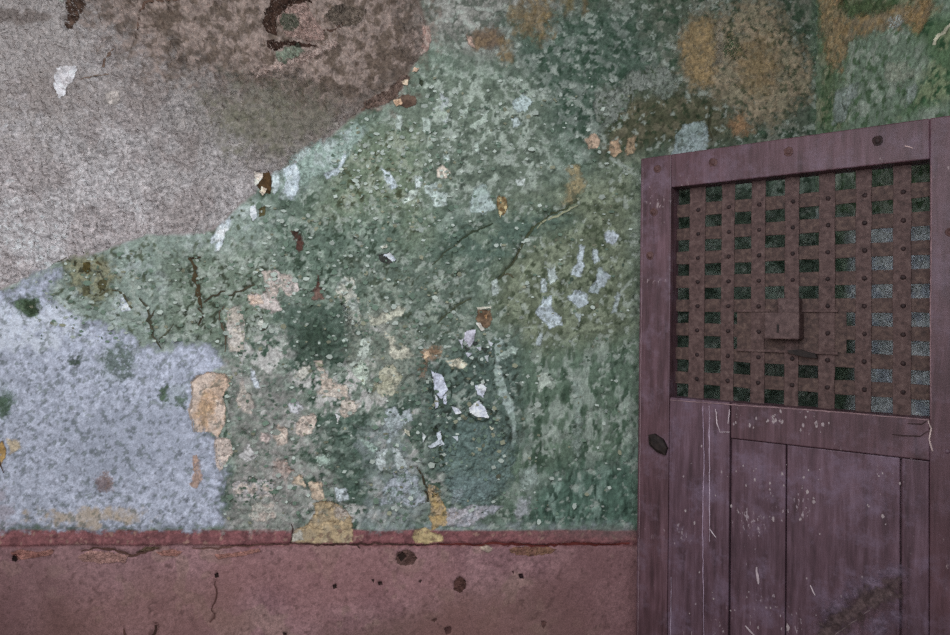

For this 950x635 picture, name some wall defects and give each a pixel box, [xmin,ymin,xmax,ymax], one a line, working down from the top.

crack [432,223,493,265]
crack [497,200,578,280]
flaking render [0,0,680,544]
crack [437,298,472,324]
flaking render [78,544,274,564]